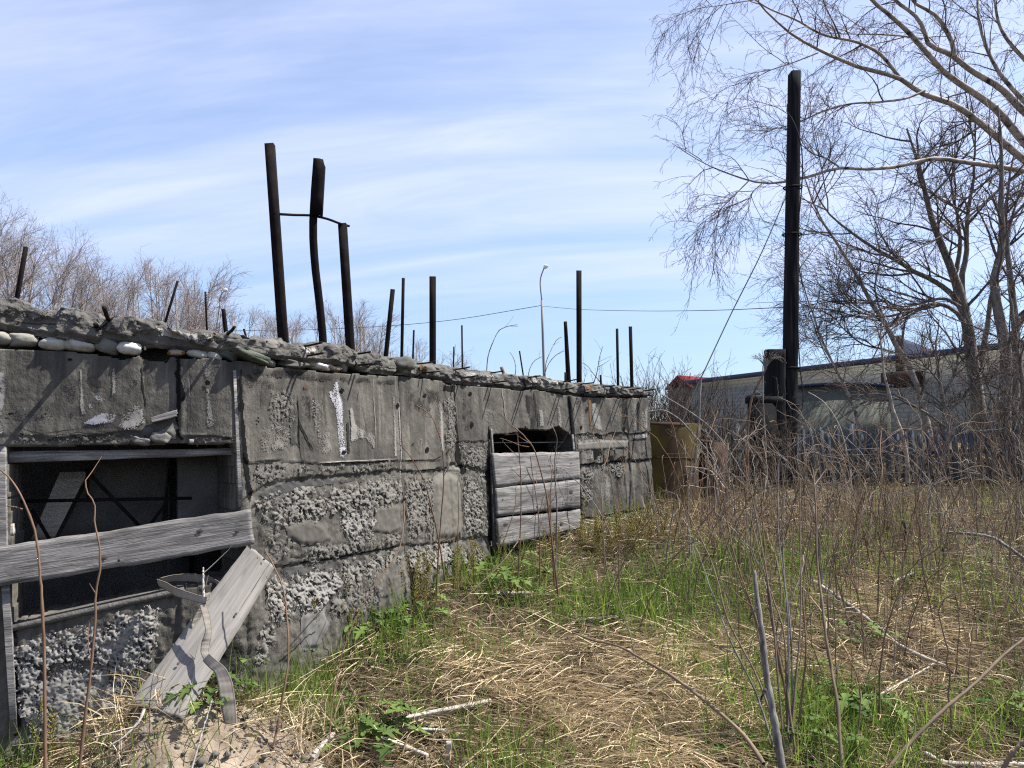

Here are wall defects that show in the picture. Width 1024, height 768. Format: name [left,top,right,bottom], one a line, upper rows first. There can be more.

leakage [246,369,395,457]
spalling [252,396,489,664]
spalling [13,605,165,768]